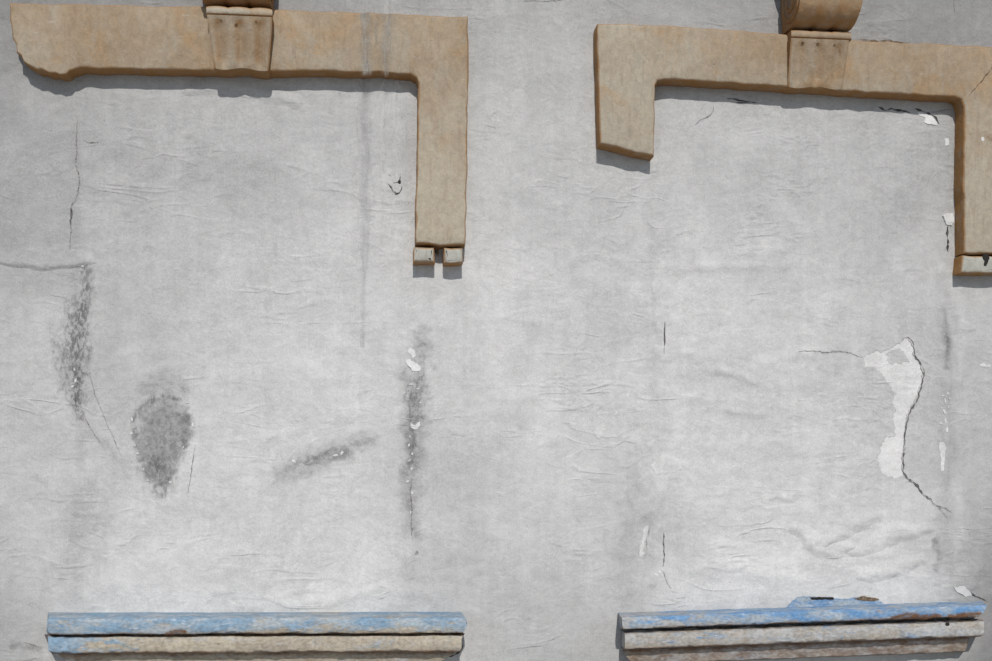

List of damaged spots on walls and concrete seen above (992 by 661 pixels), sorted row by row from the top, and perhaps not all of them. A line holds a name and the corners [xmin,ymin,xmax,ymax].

crack [879,107,949,126]
crack [69,128,99,243]
leakage [70,304,122,456]
leakage [130,398,195,491]
leakage [406,421,420,555]
leakage [406,348,421,372]
peeling [860,334,927,482]
crack [902,337,951,516]